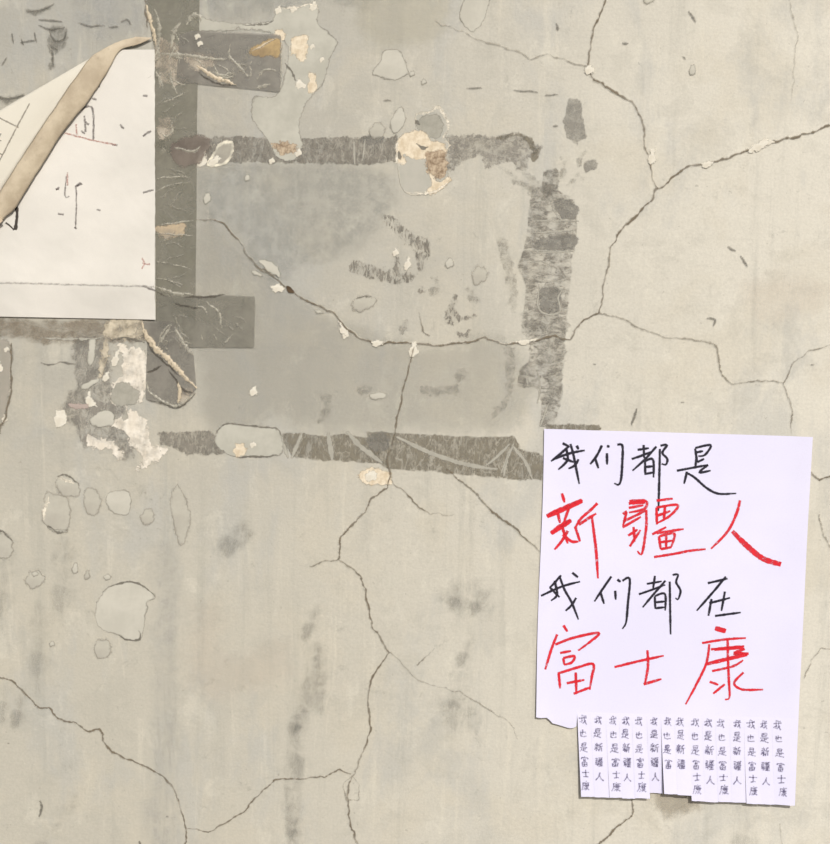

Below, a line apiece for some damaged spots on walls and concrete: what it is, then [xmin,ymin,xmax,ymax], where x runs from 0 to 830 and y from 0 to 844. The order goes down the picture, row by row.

peeling [197,140,234,167]
peeling [199,1,338,164]
spalling [369,106,452,195]
crack [569,0,830,270]
peeling [252,259,285,293]
peeling [40,319,168,473]
peeling [215,422,283,458]
crack [256,265,636,567]
crack [356,572,389,747]
crack [2,677,293,844]
crack [314,769,355,838]
crack [599,802,634,844]